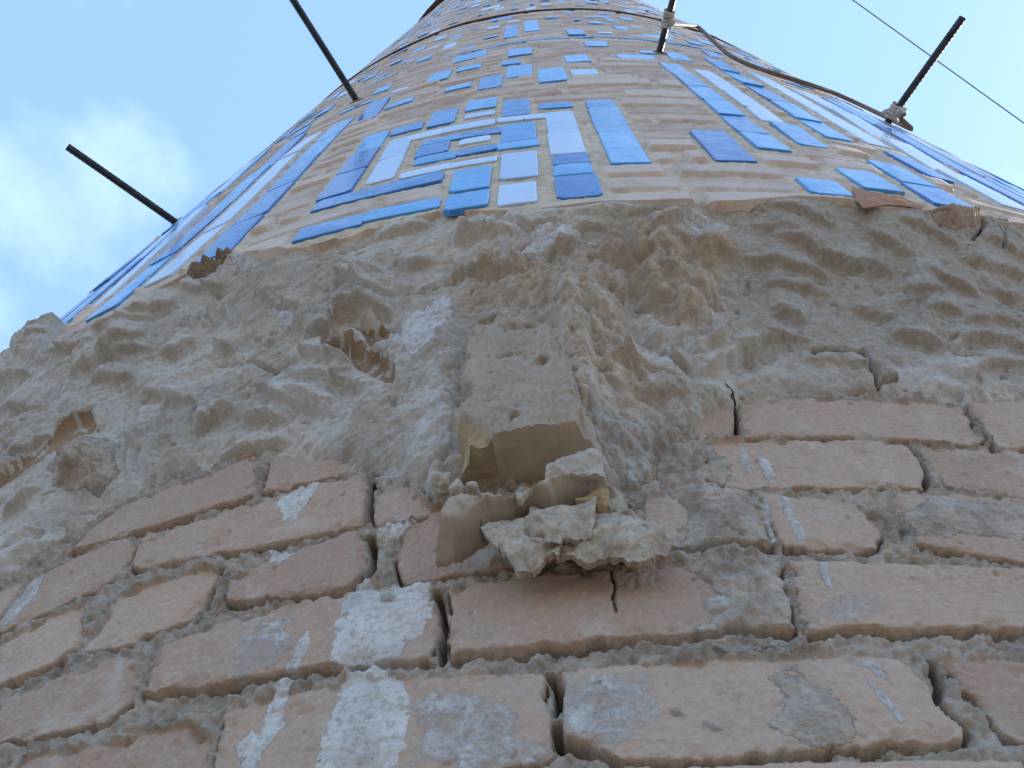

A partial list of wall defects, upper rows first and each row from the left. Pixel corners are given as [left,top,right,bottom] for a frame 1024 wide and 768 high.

spalling [851,186,984,231]
spalling [187,247,233,279]
spalling [321,324,395,383]
crack [725,383,737,435]
spalling [0,412,100,489]
peeling [436,448,672,579]
crack [610,571,618,612]